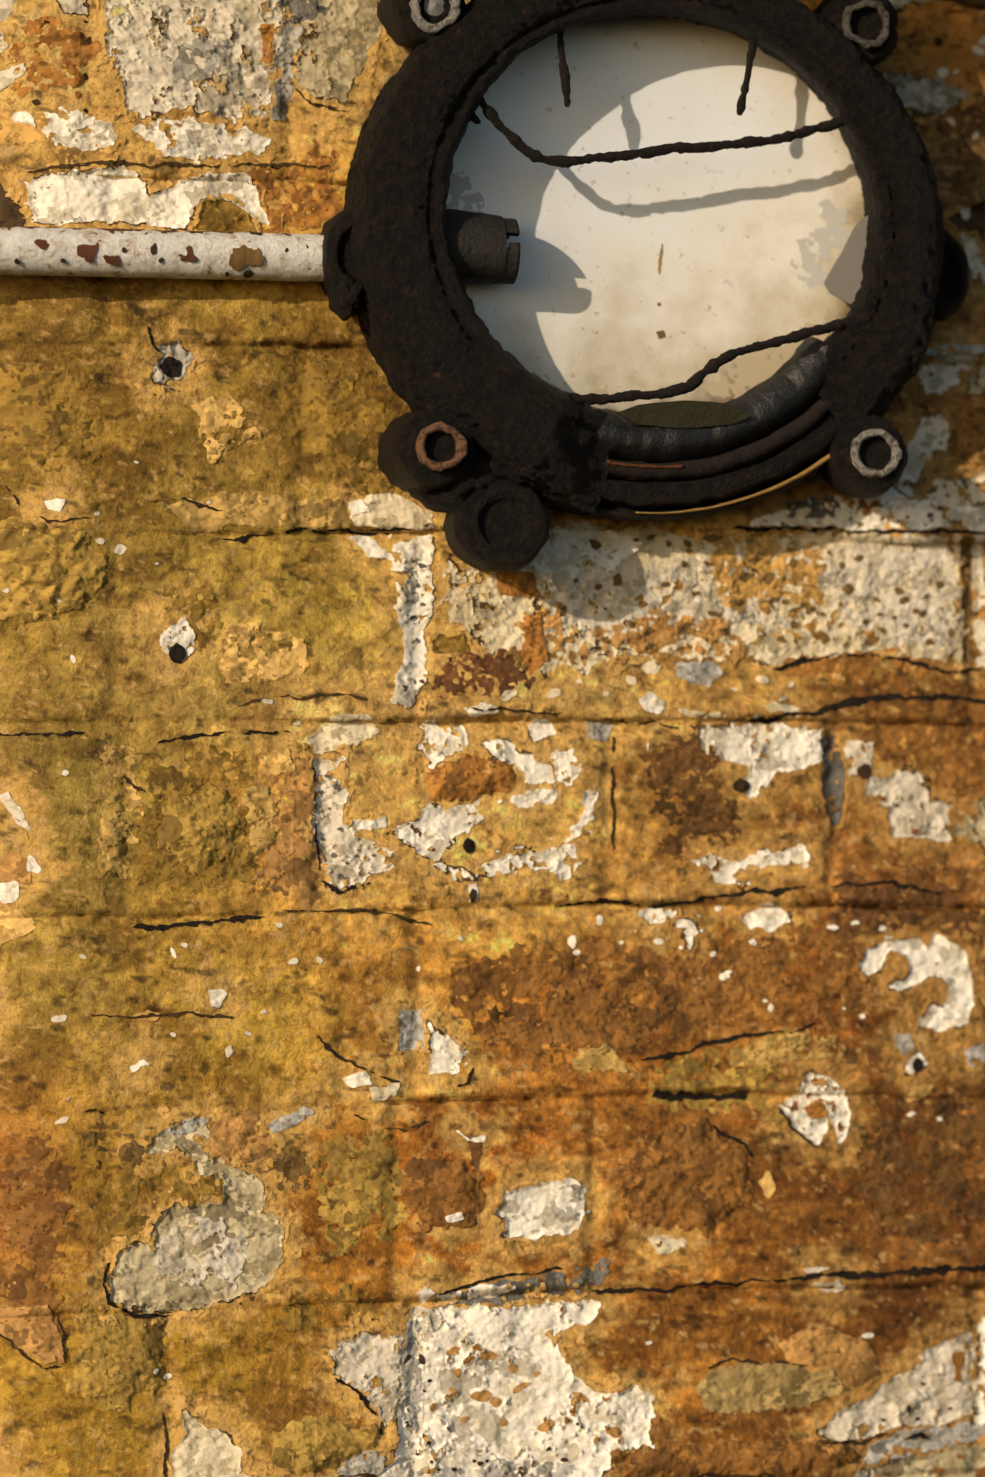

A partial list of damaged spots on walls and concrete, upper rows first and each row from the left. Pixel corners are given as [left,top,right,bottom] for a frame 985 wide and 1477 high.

spalling [6,0,392,263]
spalling [158,343,985,981]
crack [727,653,985,725]
crack [133,767,432,931]
corrosion [448,851,981,1067]
corrosion [0,1134,77,1341]
spalling [95,1103,302,1326]
corrosion [467,1137,482,1169]
spalling [309,1257,671,1477]
crack [640,1022,816,1158]
crack [591,1264,985,1295]
corrosion [802,1098,828,1119]